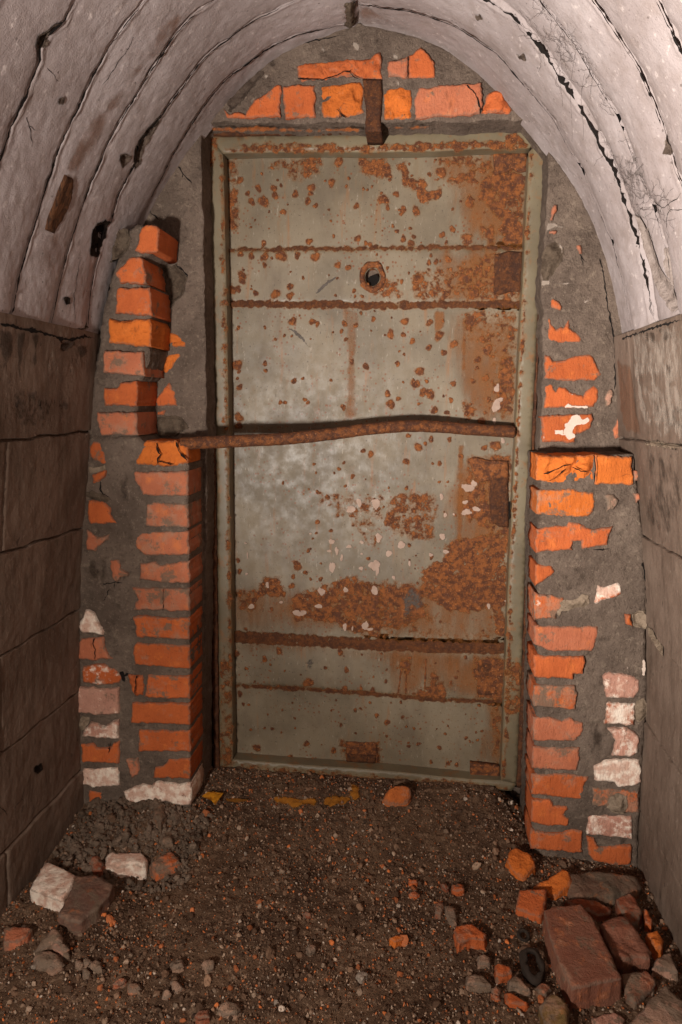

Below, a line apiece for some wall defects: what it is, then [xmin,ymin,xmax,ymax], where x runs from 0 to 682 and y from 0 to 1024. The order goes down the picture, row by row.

spalling [227,71,264,112]
crack [0,1,279,343]
crack [150,0,682,389]
spalling [90,220,131,263]
spalling [162,264,187,308]
crack [156,442,187,465]
rust [180,126,533,790]
crack [544,456,596,482]